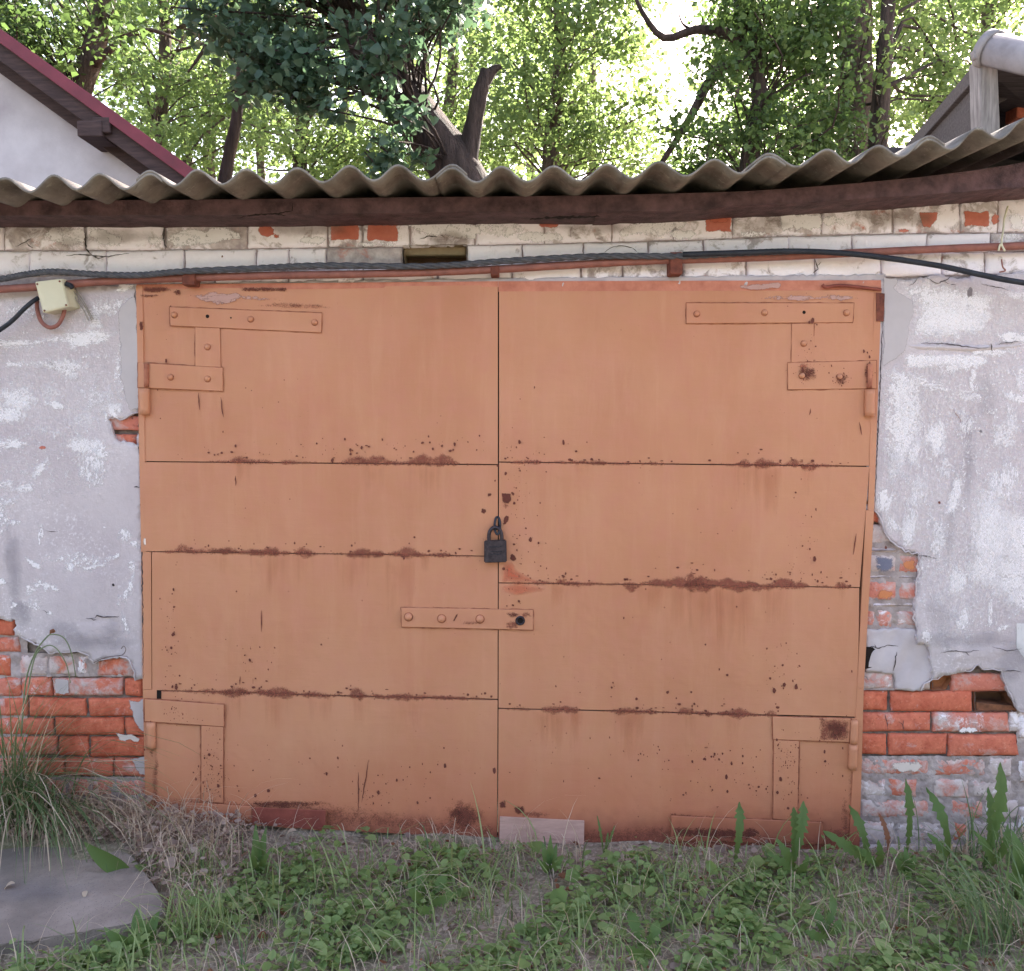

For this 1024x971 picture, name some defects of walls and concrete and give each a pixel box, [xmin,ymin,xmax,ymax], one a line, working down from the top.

crack [928,341,1019,350]
peeling [0,284,139,533]
corrosion [333,442,455,466]
corrosion [723,449,849,471]
flaking render [867,282,1024,644]
corrosion [165,542,322,558]
corrosion [342,536,473,557]
corrosion [533,562,851,593]
flaking render [0,525,145,804]
corrosion [179,678,492,701]
corrosion [616,703,780,718]
flaking render [860,647,1024,852]